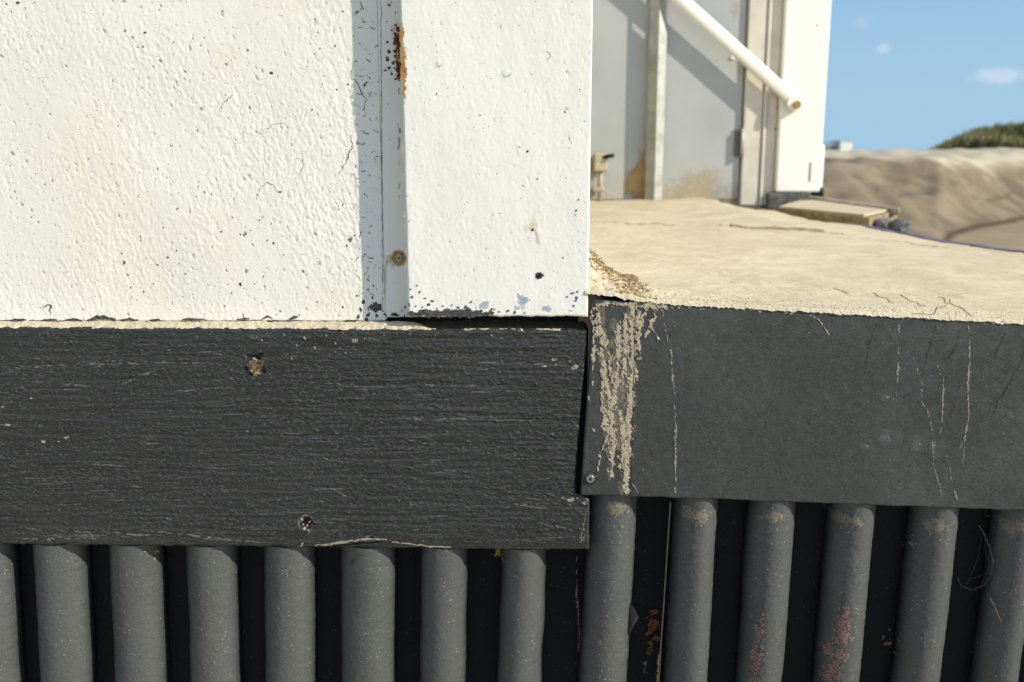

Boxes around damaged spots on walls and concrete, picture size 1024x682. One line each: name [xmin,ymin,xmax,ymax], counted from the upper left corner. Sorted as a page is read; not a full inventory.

rust [384,23,407,98]
crack [896,324,971,500]
rust [645,609,662,682]